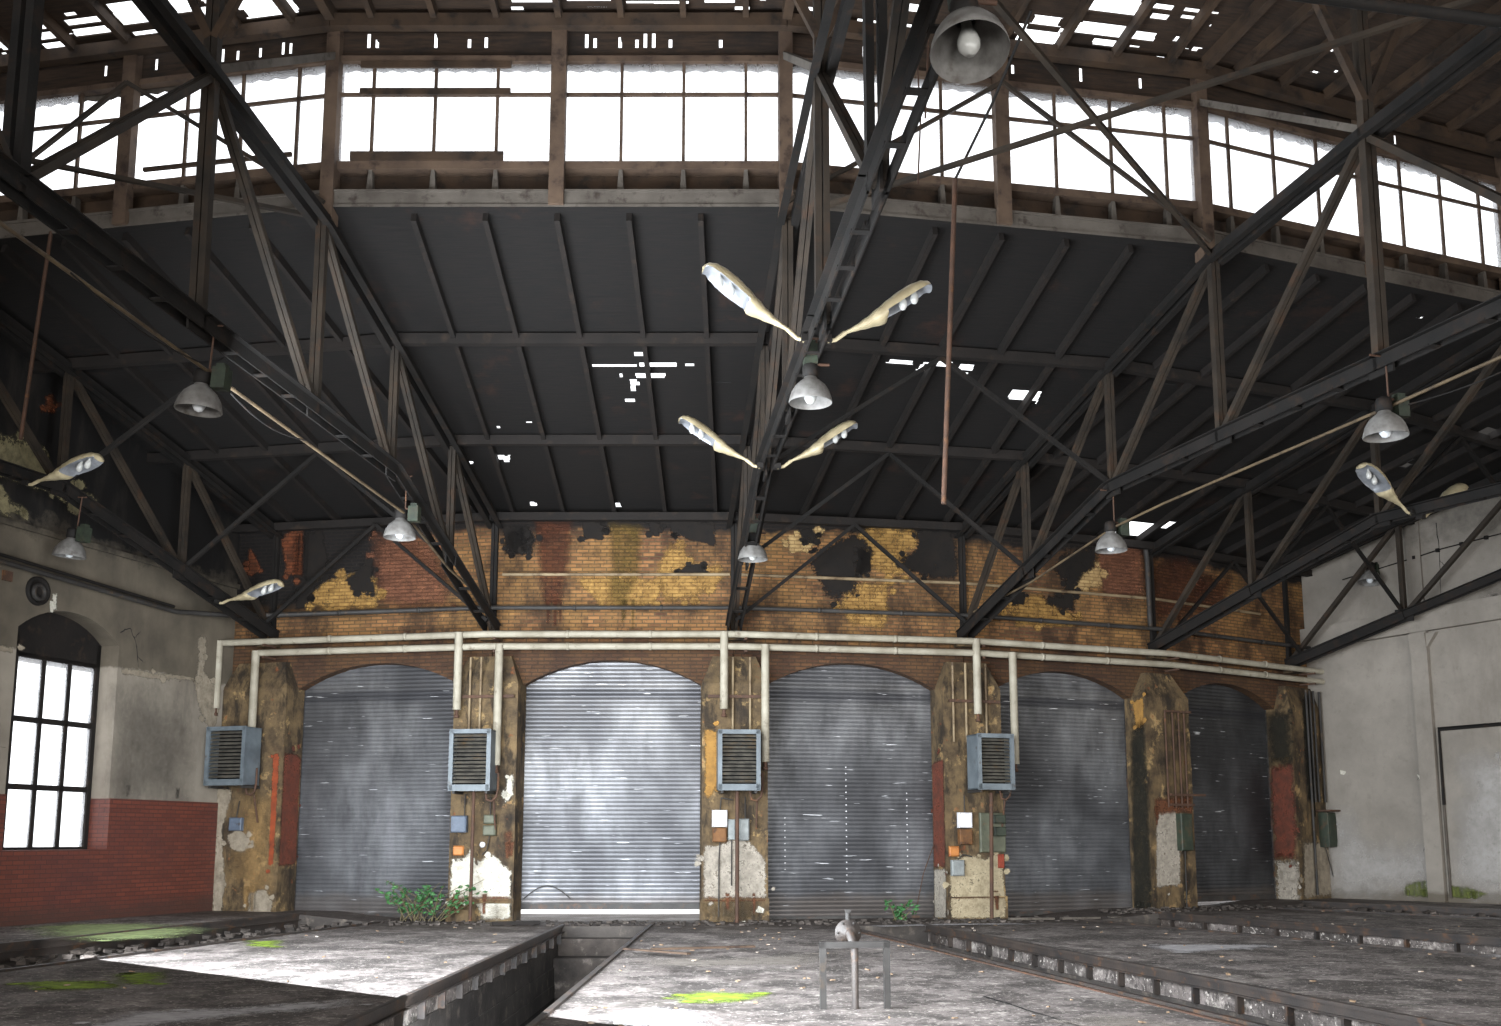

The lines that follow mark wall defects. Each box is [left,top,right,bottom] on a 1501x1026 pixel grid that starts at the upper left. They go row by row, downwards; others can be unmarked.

peeling [502,535,543,560]
peeling [577,521,722,605]
peeling [782,526,825,554]
peeling [831,528,927,628]
flaking render [1000,548,1146,631]
peeling [1130,692,1147,730]
peeling [212,744,301,912]
peeling [445,850,512,921]
peeling [695,837,775,922]
peeling [931,749,1010,919]
peeling [1156,812,1181,896]